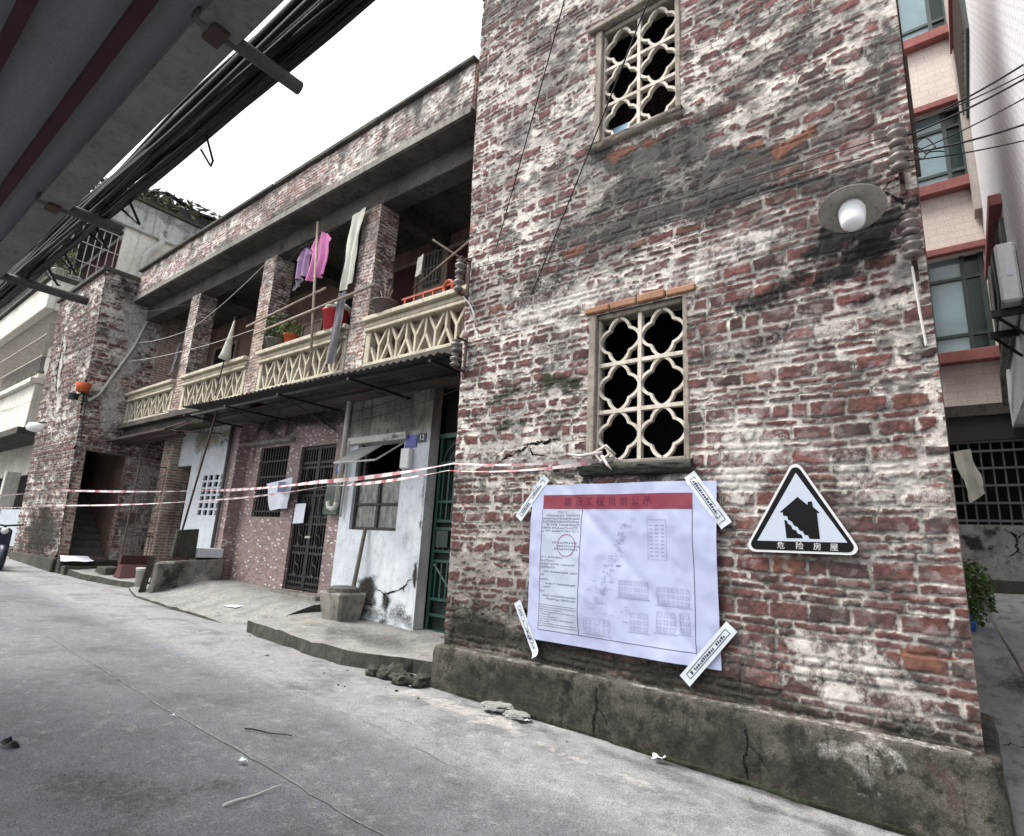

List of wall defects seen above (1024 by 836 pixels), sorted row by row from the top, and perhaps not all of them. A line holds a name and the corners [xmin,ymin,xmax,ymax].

crack [498,437,560,462]
crack [1005,529,1024,559]
crack [377,579,412,607]
leakage [324,577,411,647]
crack [742,725,765,780]